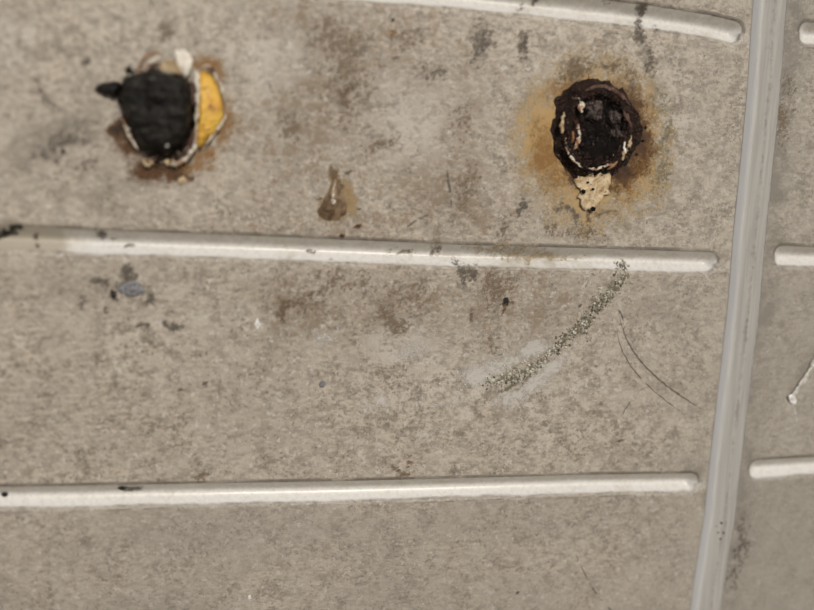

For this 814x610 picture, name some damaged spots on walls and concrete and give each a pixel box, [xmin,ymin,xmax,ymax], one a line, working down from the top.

corrosion [192,56,226,78]
corrosion [106,100,240,188]
corrosion [509,55,672,240]
damp [0,223,23,239]
crack [617,310,705,413]